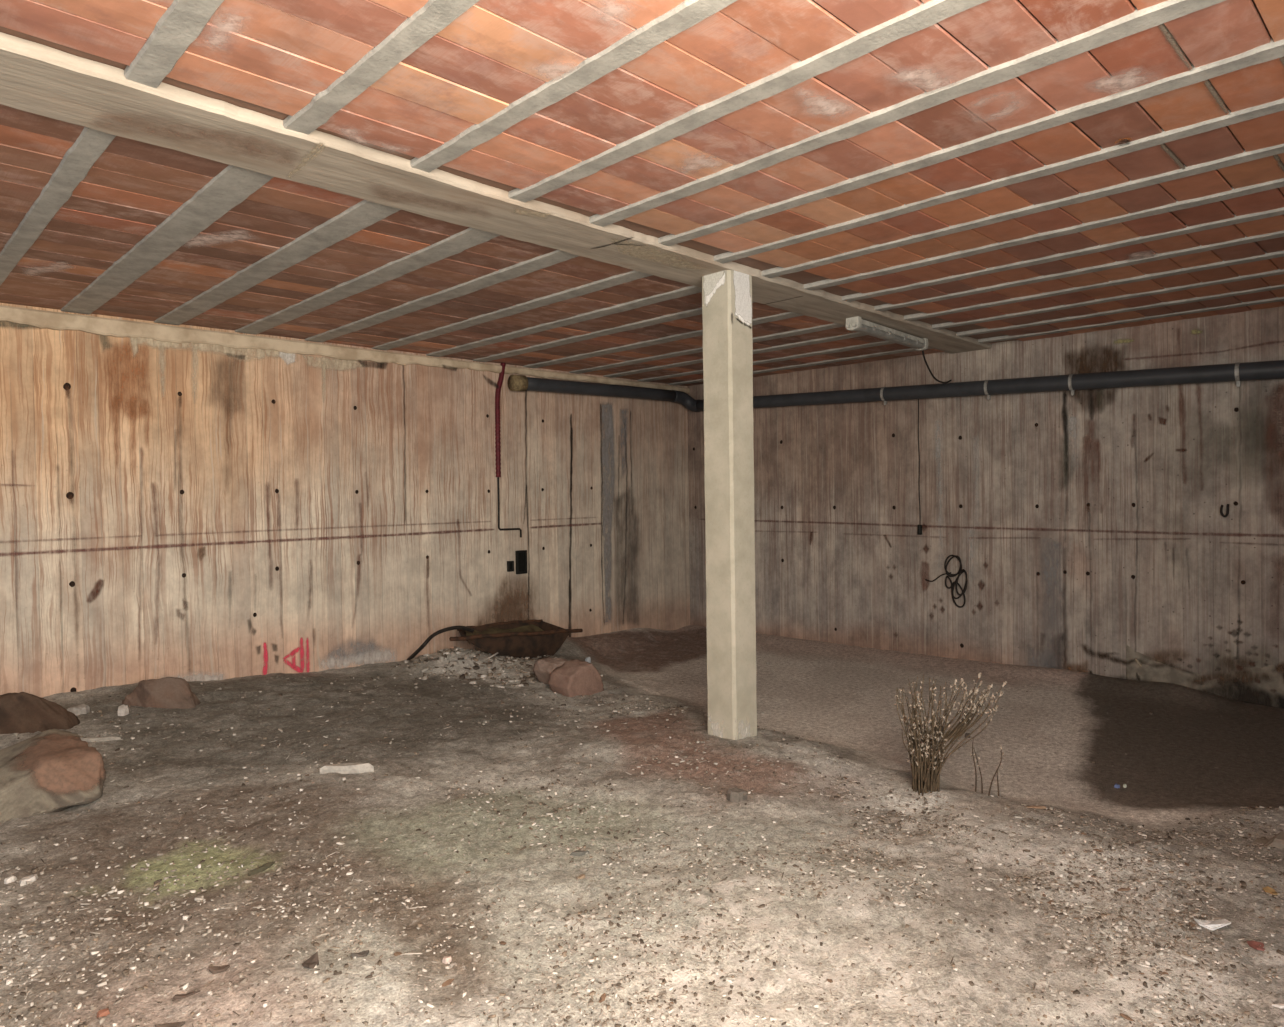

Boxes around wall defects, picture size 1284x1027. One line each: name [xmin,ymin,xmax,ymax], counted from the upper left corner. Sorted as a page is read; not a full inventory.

flaking render [703,270,752,329]
corrosion [108,345,147,431]
leakage [1067,348,1123,374]
leakage [1203,681,1284,709]